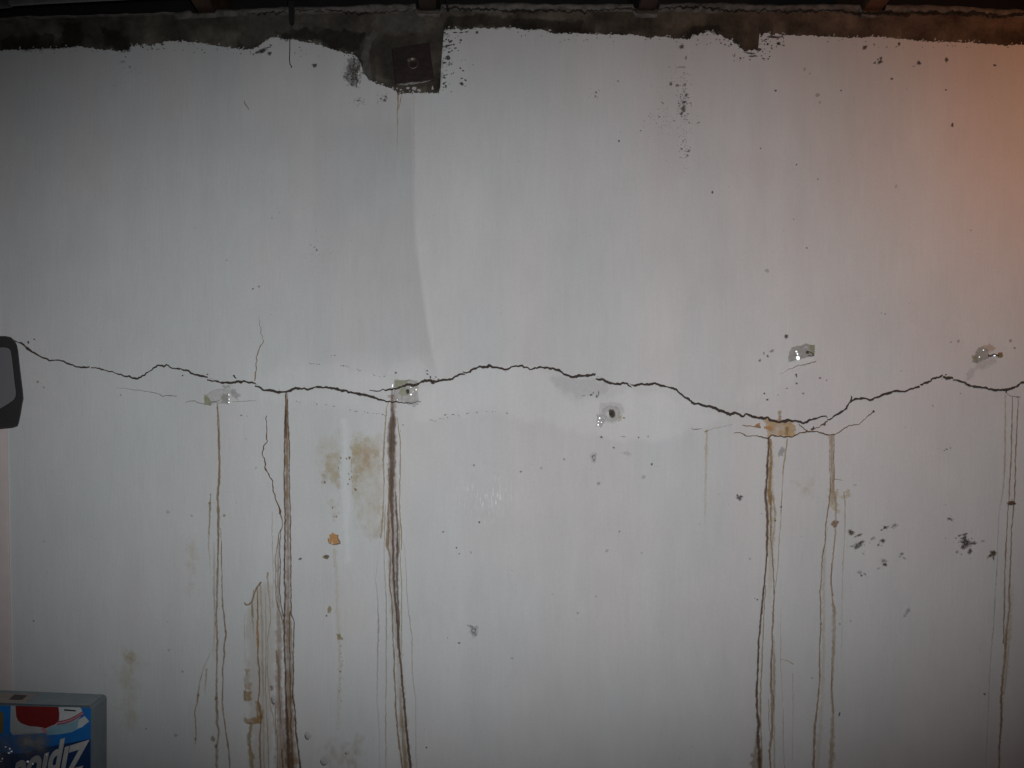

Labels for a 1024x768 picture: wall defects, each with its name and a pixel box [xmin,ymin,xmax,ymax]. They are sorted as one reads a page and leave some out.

peeling [0,9,1024,95]
rust [209,407,230,768]
rust [244,393,301,768]
rust [322,533,341,559]
rust [383,395,411,768]
crack [15,332,1024,514]
rust [743,417,795,768]
rust [812,435,839,768]
rust [1003,398,1019,658]